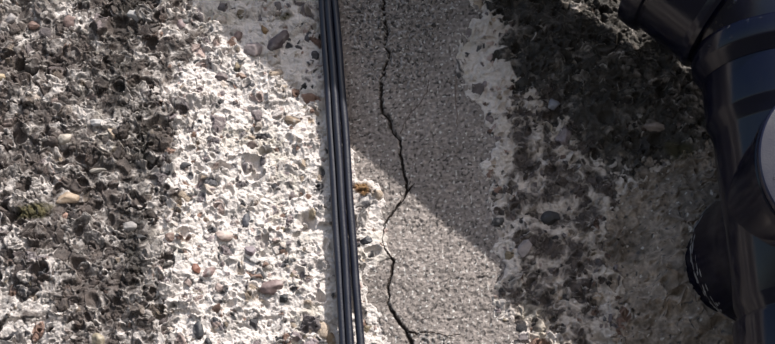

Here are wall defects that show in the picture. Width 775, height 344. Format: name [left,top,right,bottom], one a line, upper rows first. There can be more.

crack [379,0,460,344]